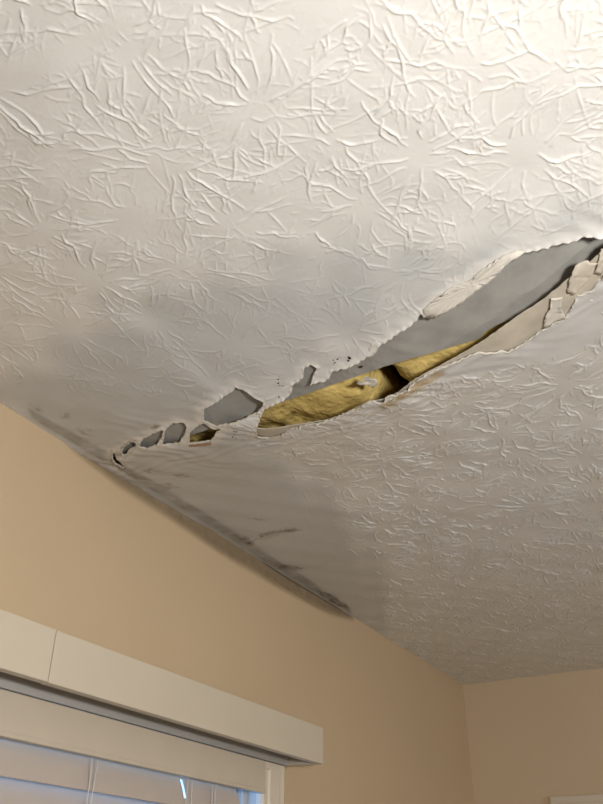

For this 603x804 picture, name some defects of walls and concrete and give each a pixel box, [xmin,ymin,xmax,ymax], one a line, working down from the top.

leakage [91,460,350,616]